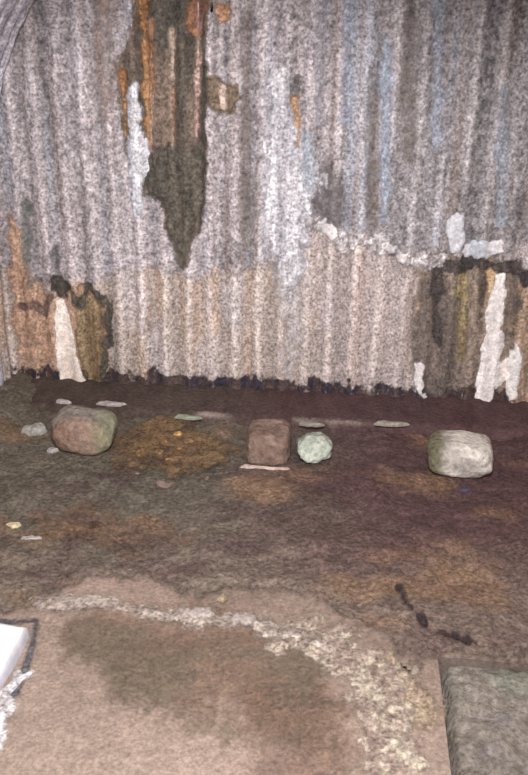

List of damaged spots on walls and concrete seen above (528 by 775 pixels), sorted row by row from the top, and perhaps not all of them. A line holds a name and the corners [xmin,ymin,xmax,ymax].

spalling [114,0,242,270]
peeling [6,198,114,382]
peeling [307,213,528,403]